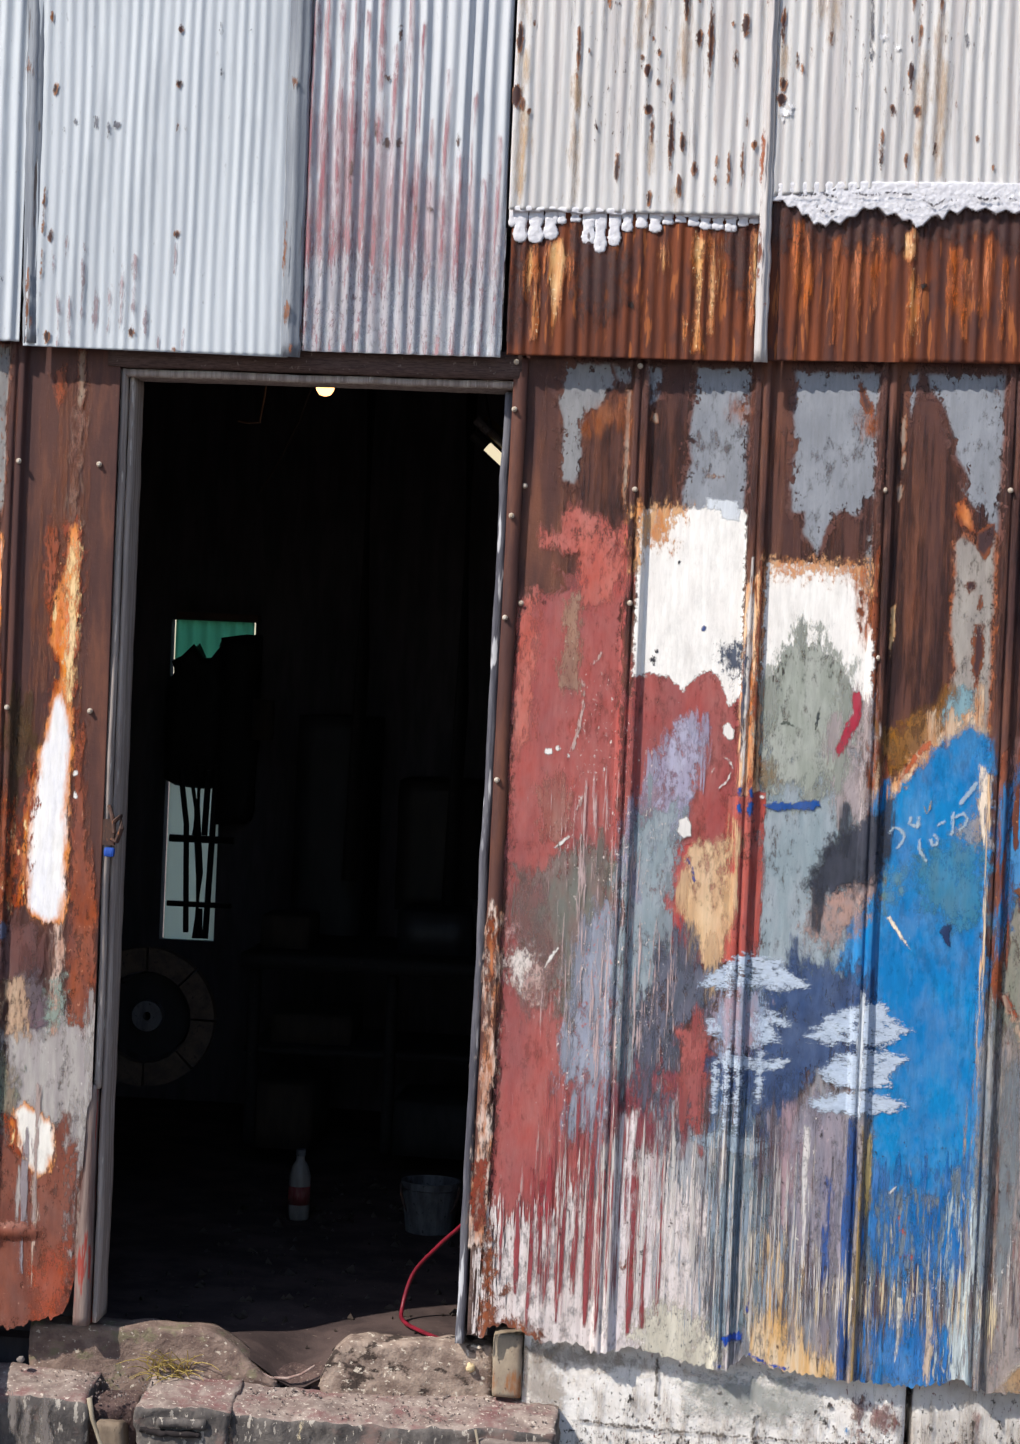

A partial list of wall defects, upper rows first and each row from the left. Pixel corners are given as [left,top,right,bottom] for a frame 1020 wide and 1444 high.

rust [506,222,630,342]
rust [682,200,1020,355]
peeling [552,357,760,516]
rust [42,348,99,1029]
rust [800,415,961,824]
peeling [781,361,1015,761]
rust [989,747,1020,1009]
rust [0,1112,82,1330]
spalling [87,1389,207,1444]
spalling [251,1361,325,1390]
peeling [468,900,849,1380]
peeling [932,1189,988,1387]